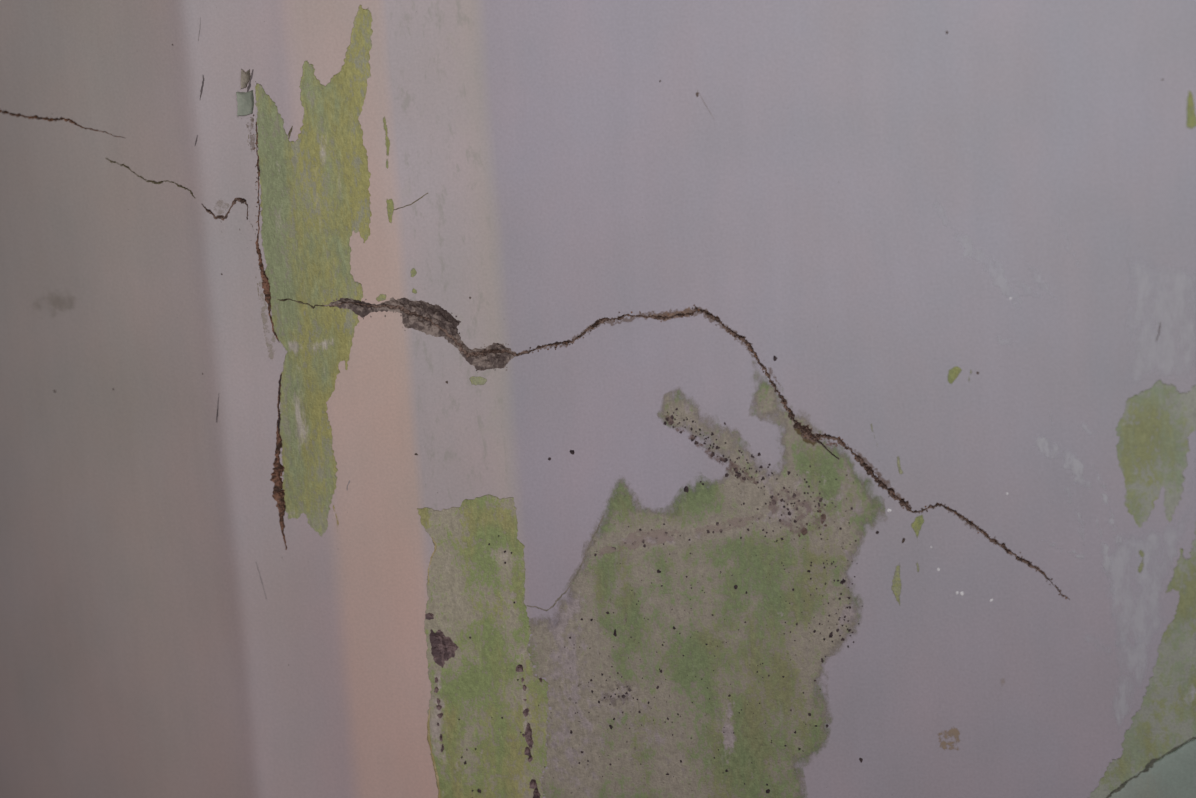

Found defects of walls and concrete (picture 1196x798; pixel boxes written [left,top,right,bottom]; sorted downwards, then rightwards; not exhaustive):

peeling [236,5,386,536]
peeling [386,199,394,223]
crack [0,109,1070,600]
peeling [417,382,885,798]
peeling [1090,523,1196,798]
peeling [1115,380,1196,528]
peeling [1186,91,1196,128]